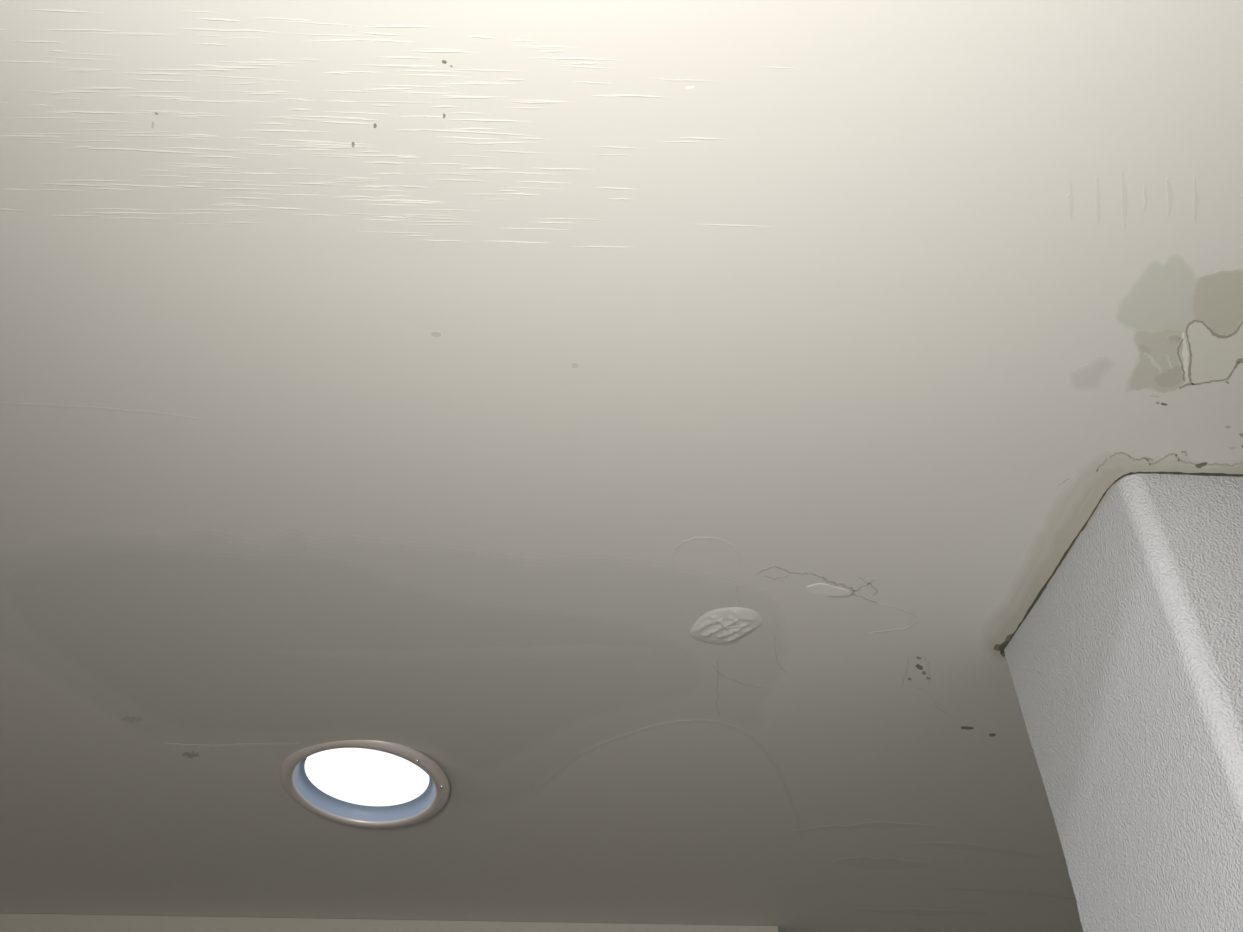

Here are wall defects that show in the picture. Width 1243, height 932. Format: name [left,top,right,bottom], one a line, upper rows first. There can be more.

peeling [1182,322,1243,384]
crack [754,566,878,604]
water stain [0,528,791,811]